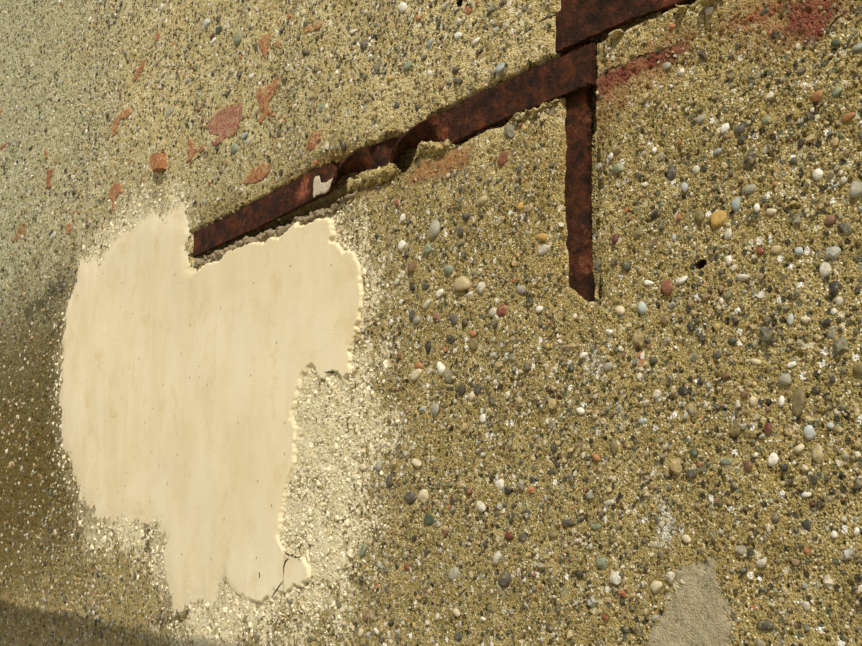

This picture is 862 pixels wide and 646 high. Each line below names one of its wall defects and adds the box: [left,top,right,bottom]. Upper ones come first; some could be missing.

corrosion [731,0,837,45]
spalling [426,59,539,118]
spalling [509,98,564,122]
corrosion [596,40,687,104]
corrosion [401,146,471,183]
spalling [414,139,459,160]
spalling [193,163,402,269]
peeling [283,552,312,594]